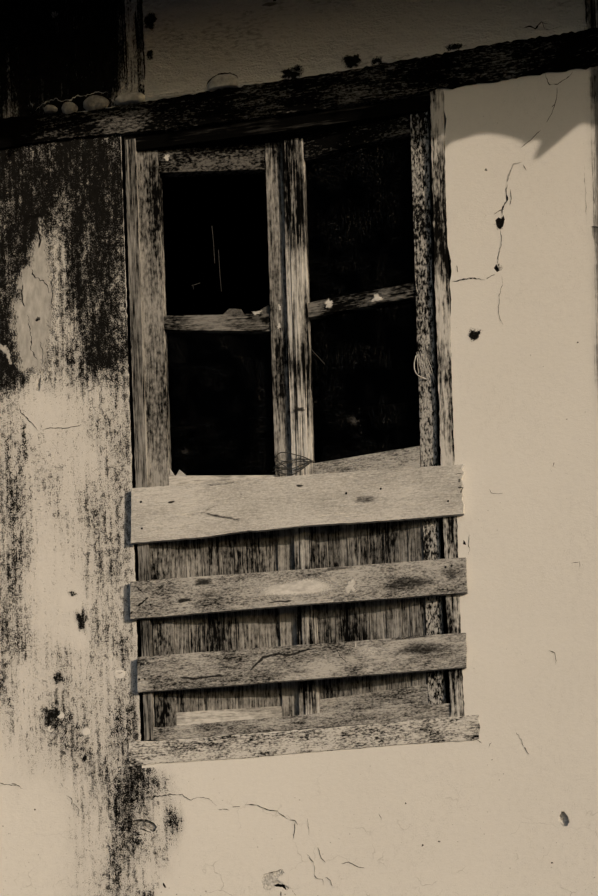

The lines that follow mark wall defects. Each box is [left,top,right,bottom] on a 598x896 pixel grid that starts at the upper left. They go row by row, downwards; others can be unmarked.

leakage [0,0,157,118]
crack [455,73,572,324]
leakage [0,134,178,896]
crack [142,794,309,838]
spalling [261,869,295,895]